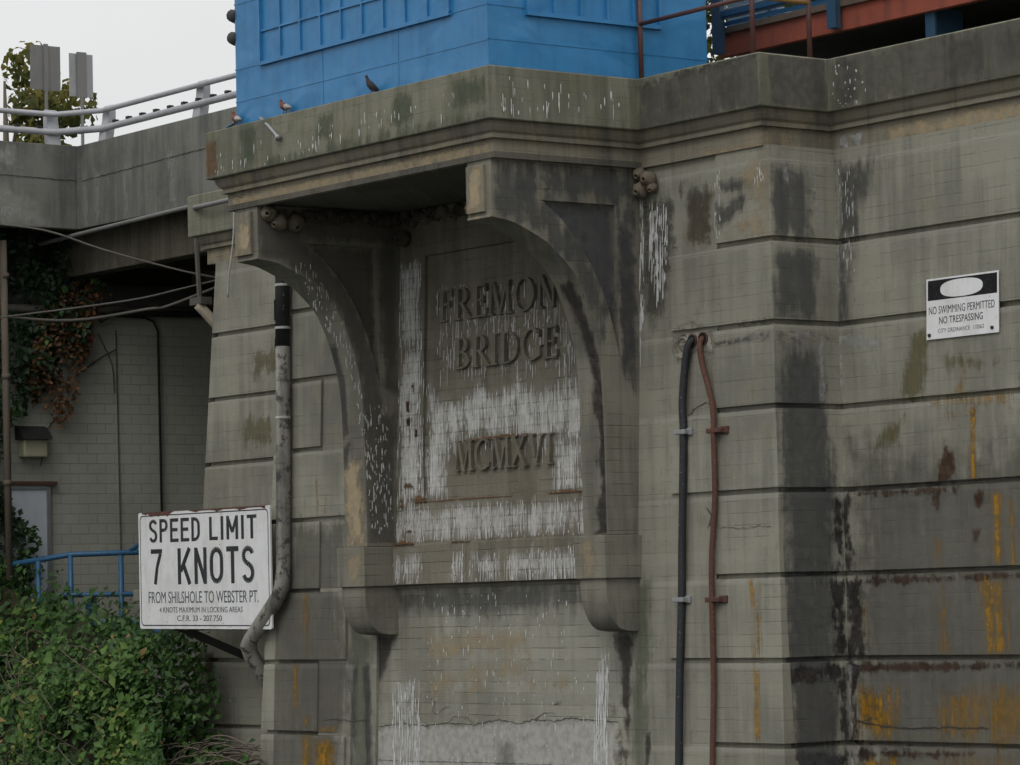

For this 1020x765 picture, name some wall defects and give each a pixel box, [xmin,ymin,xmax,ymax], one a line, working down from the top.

damp [237,224,250,252]
damp [233,143,490,205]
damp [714,168,806,238]
damp [834,165,867,322]
damp [776,250,815,318]
damp [260,165,668,584]
damp [903,331,926,402]
damp [776,349,1020,765]
corrosion [994,492,1012,562]
damp [351,634,633,765]